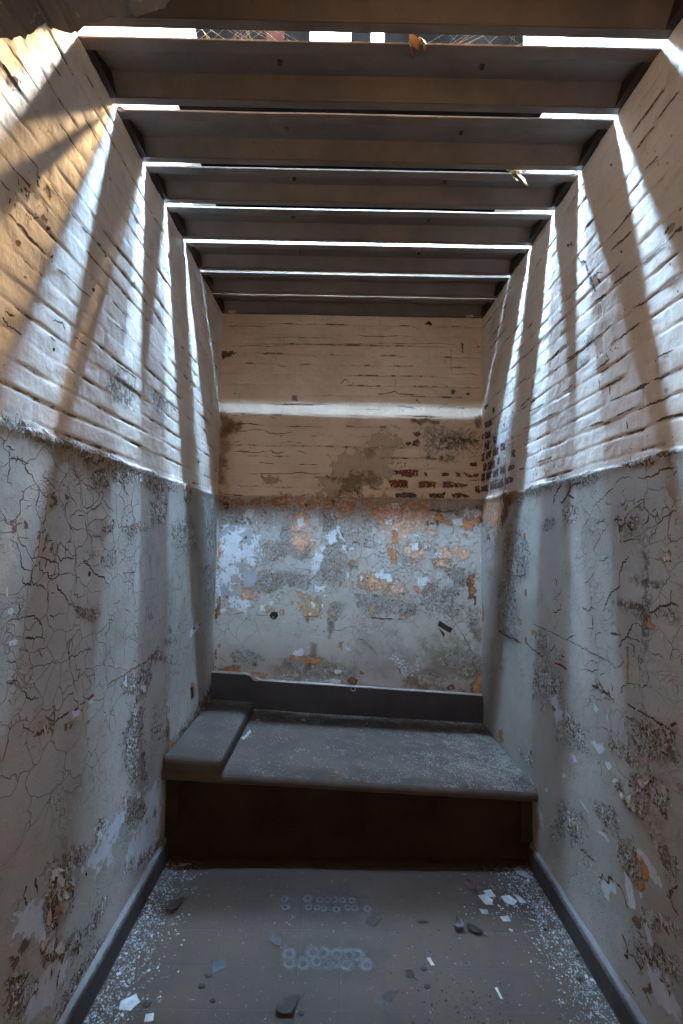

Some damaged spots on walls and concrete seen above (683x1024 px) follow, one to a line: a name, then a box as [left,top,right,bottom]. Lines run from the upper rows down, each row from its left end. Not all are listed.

crack [6,446,185,737]
leakage [218,416,241,484]
peeling [1,411,468,632]
leakage [326,470,381,496]
crack [499,466,679,699]
peeling [0,636,177,1024]
peeling [86,863,202,1023]
peeling [388,404,683,1024]